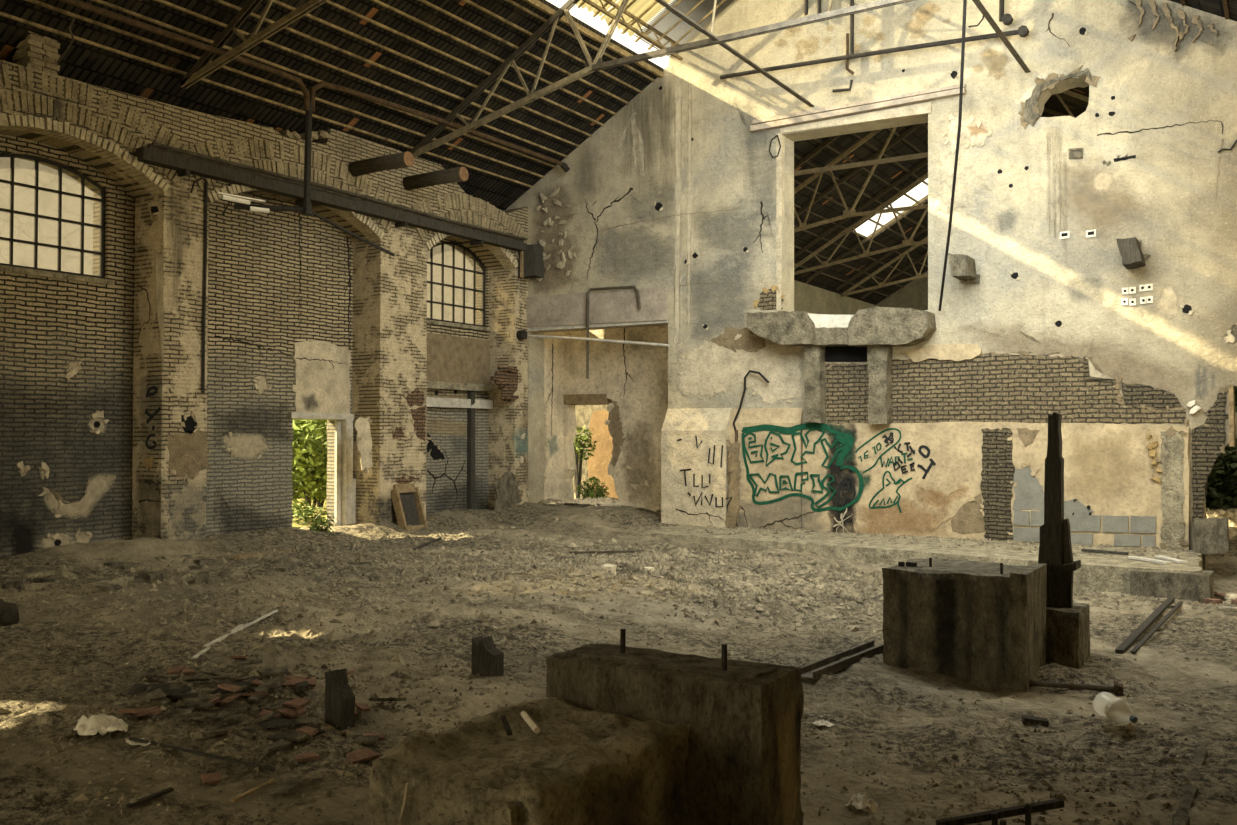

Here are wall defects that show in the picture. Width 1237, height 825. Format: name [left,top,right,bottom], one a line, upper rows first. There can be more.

spalling [1018,65,1100,129]
flaking render [536,188,577,281]
crack [585,188,768,291]
peeling [17,461,65,518]
peeling [91,410,109,434]
spalling [605,401,654,493]
flaking render [824,361,869,424]
flaking render [891,351,1228,550]